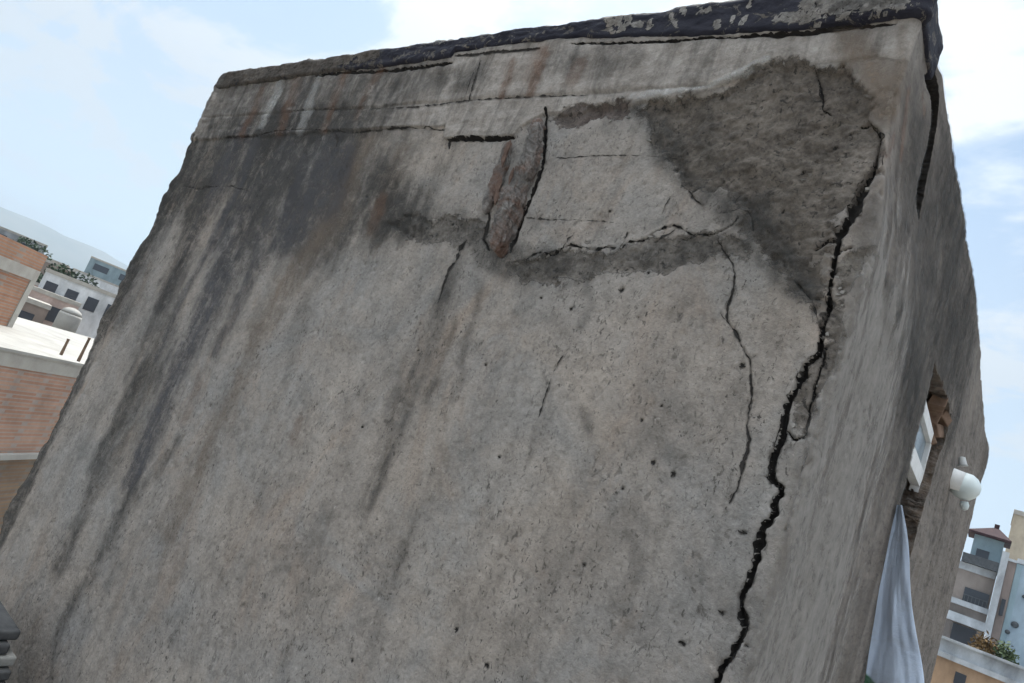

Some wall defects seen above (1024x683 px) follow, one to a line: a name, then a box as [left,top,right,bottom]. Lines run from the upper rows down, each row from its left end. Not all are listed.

peeling [604,13,654,34]
peeling [669,0,752,30]
peeling [771,0,912,30]
leakage [0,96,428,547]
crack [227,47,885,683]
spalling [505,55,886,434]